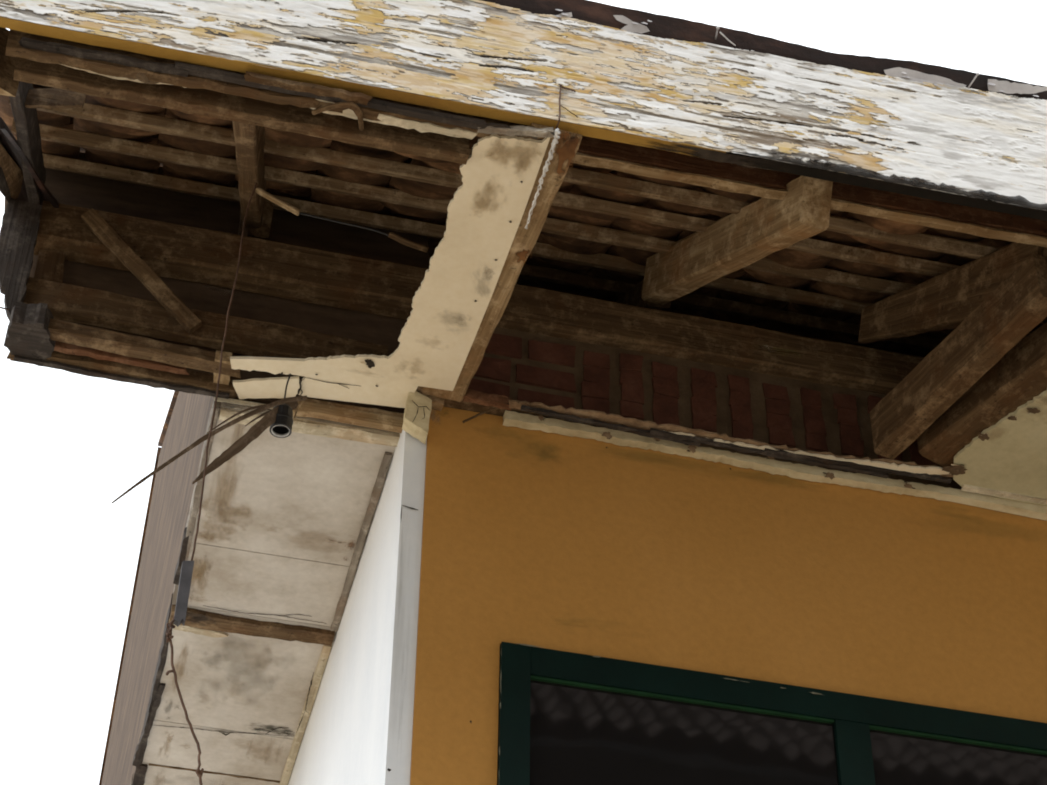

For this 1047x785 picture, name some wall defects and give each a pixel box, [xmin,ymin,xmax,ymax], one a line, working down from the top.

peeling [0,0,1047,207]
spalling [942,464,967,475]